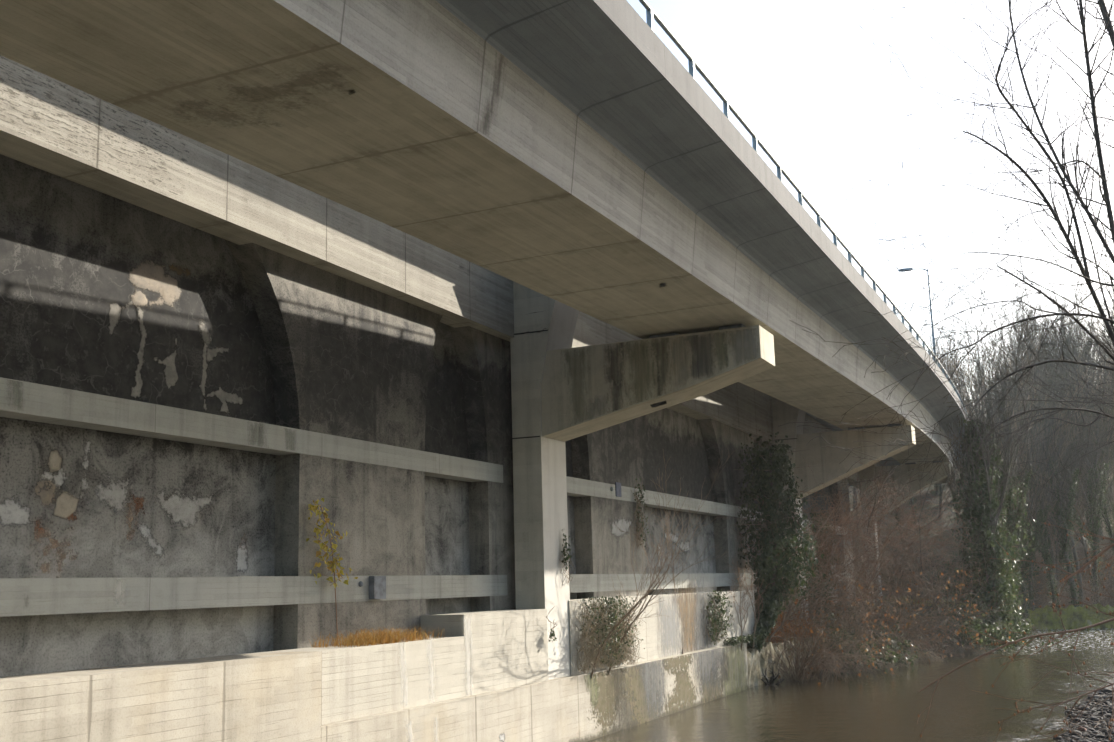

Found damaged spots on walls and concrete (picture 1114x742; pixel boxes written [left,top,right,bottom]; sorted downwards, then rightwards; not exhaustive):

peeling [108,260,190,398]
water stain [590,329,756,417]
peeling [0,450,79,529]
peeling [94,476,133,514]
peeling [155,489,213,530]
water stain [586,659,666,736]
water stain [694,645,747,703]